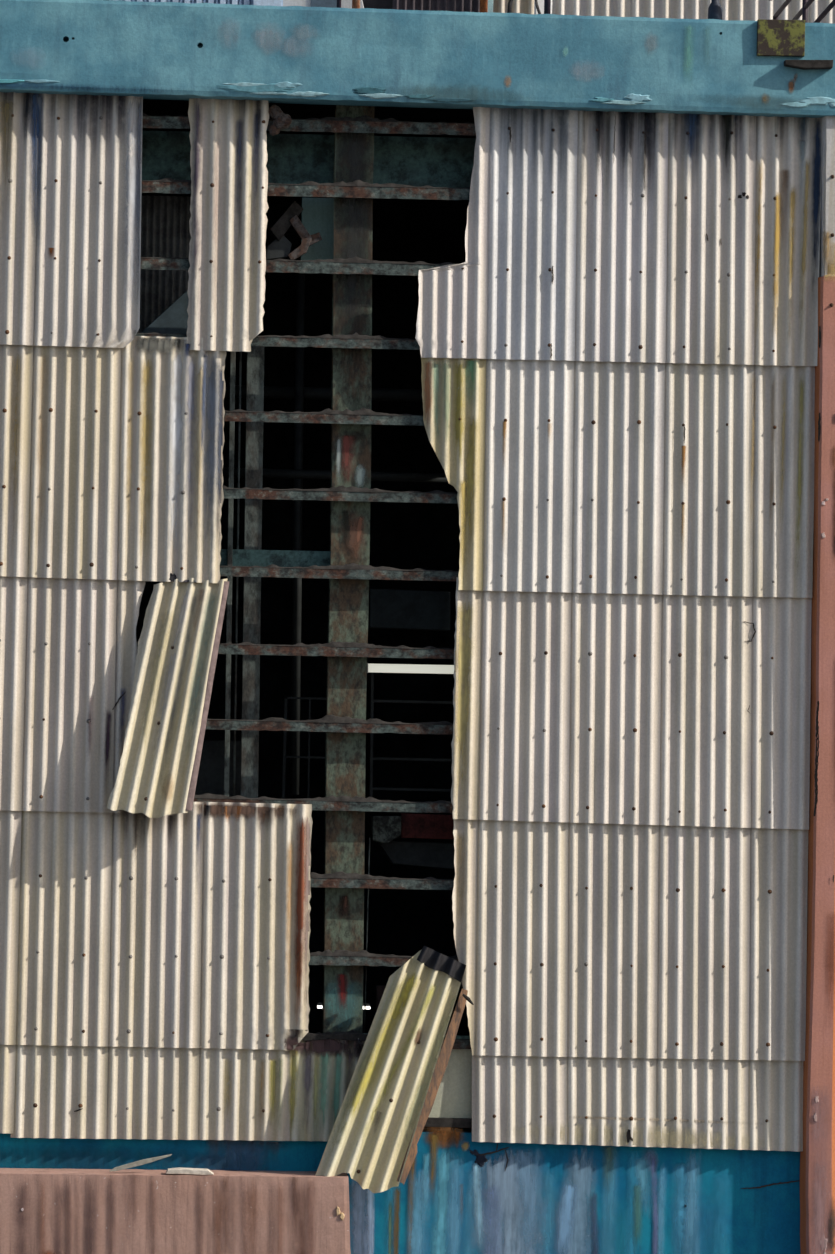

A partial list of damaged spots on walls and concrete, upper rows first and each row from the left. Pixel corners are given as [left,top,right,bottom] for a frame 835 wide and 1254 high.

corrosion [269,104,292,136]
water stain [673,98,792,161]
water stain [0,83,145,278]
water stain [801,117,821,262]
corrosion [337,431,365,486]
corrosion [424,361,476,529]
corrosion [455,607,471,755]
corrosion [201,804,311,996]
corrosion [428,1127,469,1185]
corrosion [389,1159,415,1254]
corrosion [813,1162,835,1254]